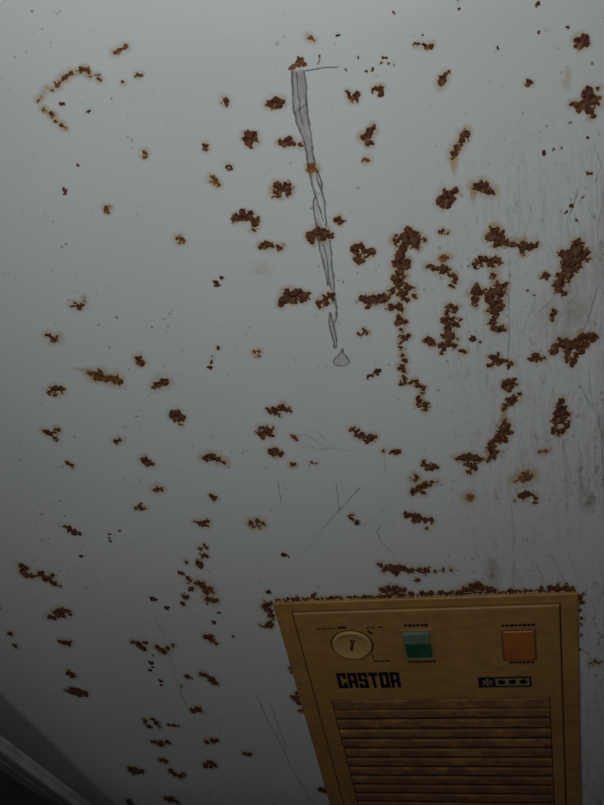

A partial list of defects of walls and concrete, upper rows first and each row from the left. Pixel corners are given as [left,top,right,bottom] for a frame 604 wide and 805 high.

corrosion [37,66,103,130]
corrosion [569,85,602,119]
corrosion [230,208,260,232]
corrosion [257,240,285,252]
corrosion [350,242,376,265]
corrosion [539,237,591,297]
corrosion [422,223,539,355]
corrosion [358,225,431,412]
corrosion [527,330,599,368]
corrosion [85,368,124,386]
corrosion [454,352,522,475]
corrosion [549,398,571,437]